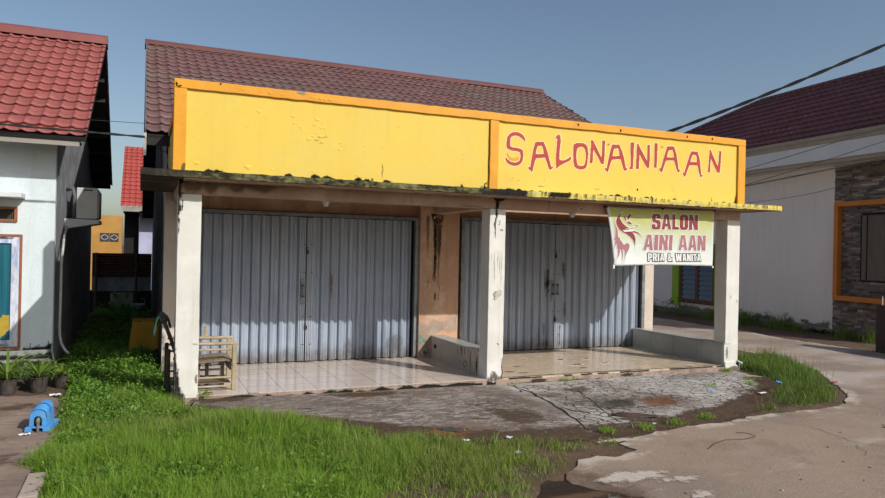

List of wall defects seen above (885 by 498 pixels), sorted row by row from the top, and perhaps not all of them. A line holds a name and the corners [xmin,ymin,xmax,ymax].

crack [480,125,523,238]
damp [427,214,443,269]